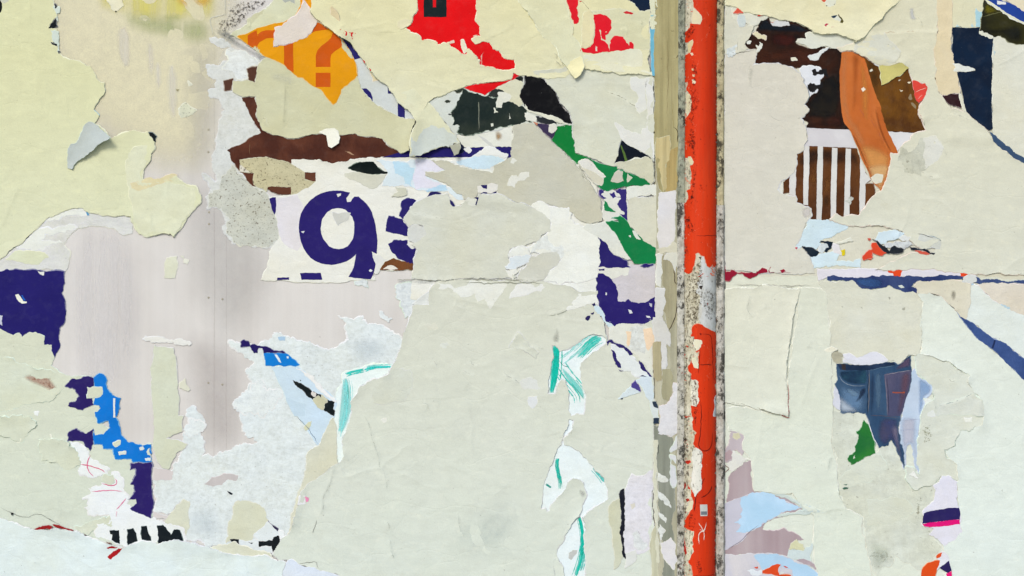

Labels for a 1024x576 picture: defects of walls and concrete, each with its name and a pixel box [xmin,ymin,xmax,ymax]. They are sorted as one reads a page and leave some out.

peeling [691,9,702,24]
peeling [246,66,257,82]
peeling [223,78,234,92]
peeling [685,68,696,116]
peeling [319,128,340,148]
peeling [611,170,633,183]
peeling [86,386,103,398]